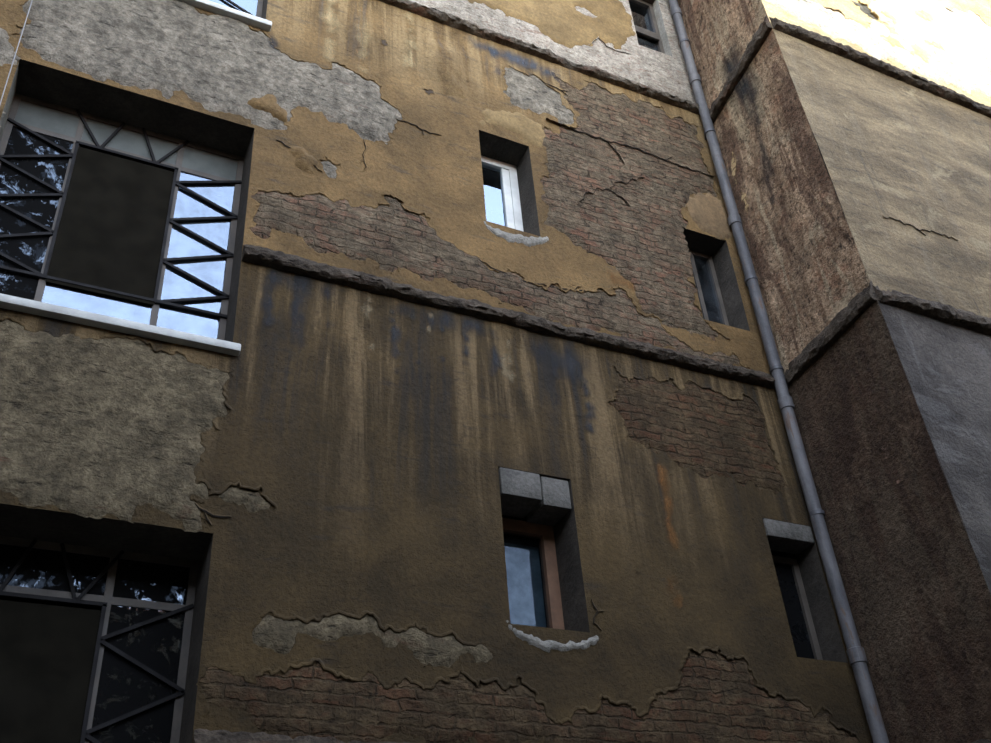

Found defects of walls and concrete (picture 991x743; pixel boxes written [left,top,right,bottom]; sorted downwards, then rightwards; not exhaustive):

flaking render [0,0,407,147]
peeling [764,0,991,99]
flaking render [246,66,751,370]
crack [885,217,956,240]
flaking render [0,316,278,533]